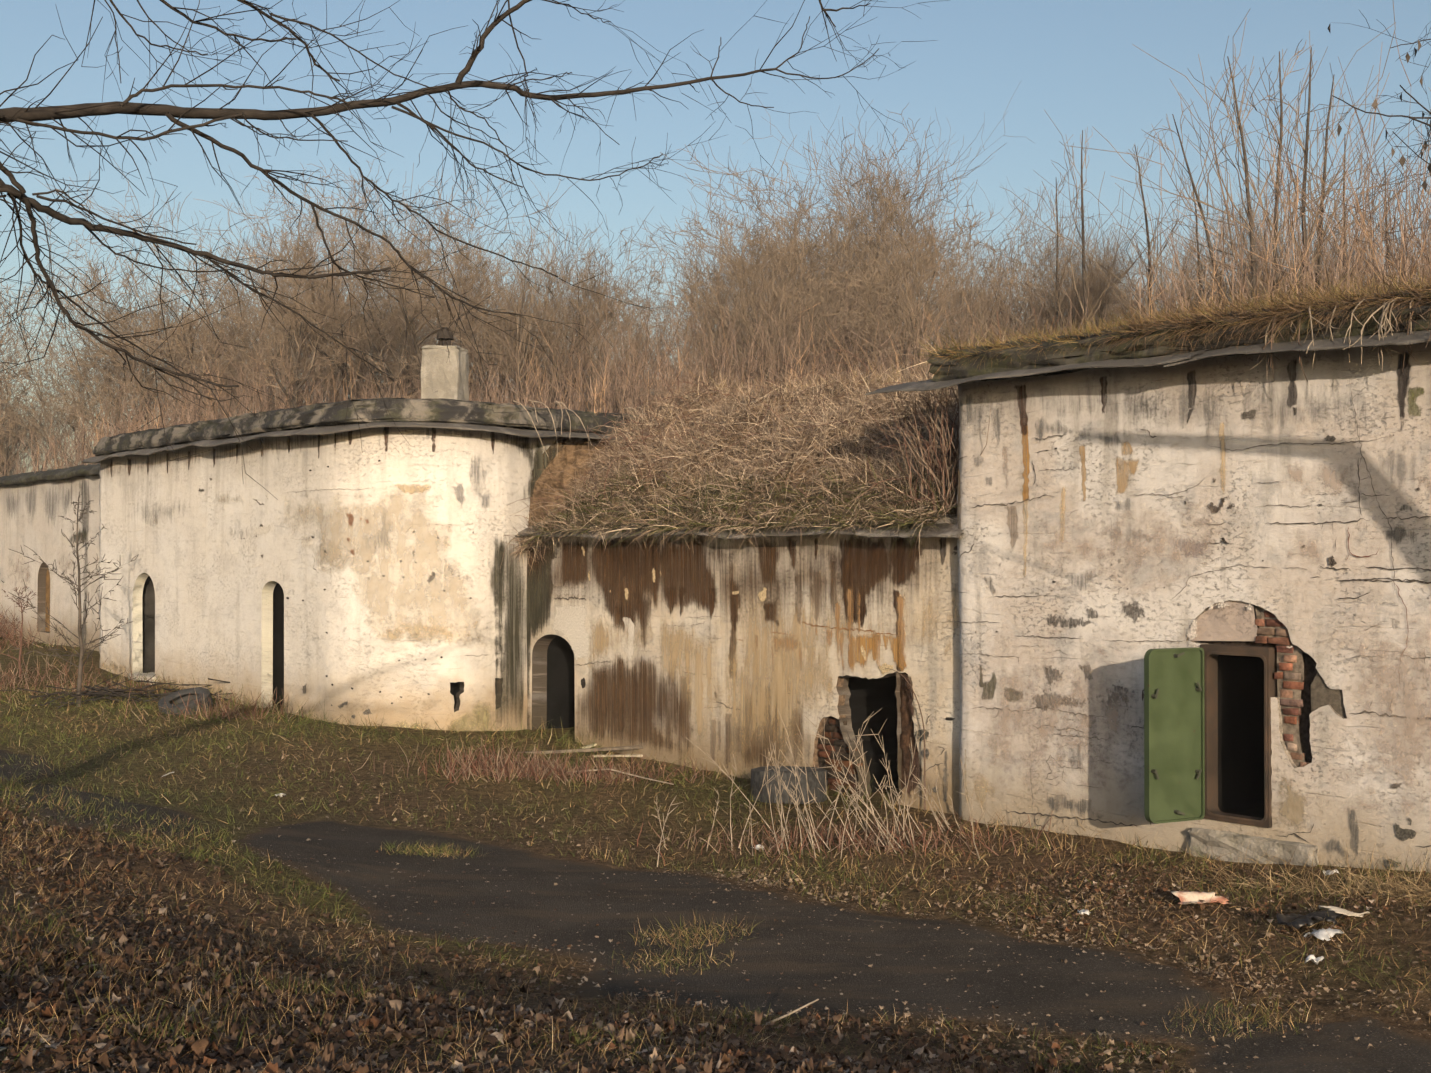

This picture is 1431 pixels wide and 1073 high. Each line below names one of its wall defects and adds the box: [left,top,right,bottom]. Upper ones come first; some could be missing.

damp [1397,352,1424,428]
damp [299,485,465,638]
crack [960,434,1076,557]
crack [1130,480,1203,498]
crack [1171,385,1431,720]
damp [453,537,922,753]
damp [712,686,803,766]
spalling [813,675,863,795]
spalling [860,646,930,804]
corrosion [905,749,922,796]
spalling [1186,600,1347,768]